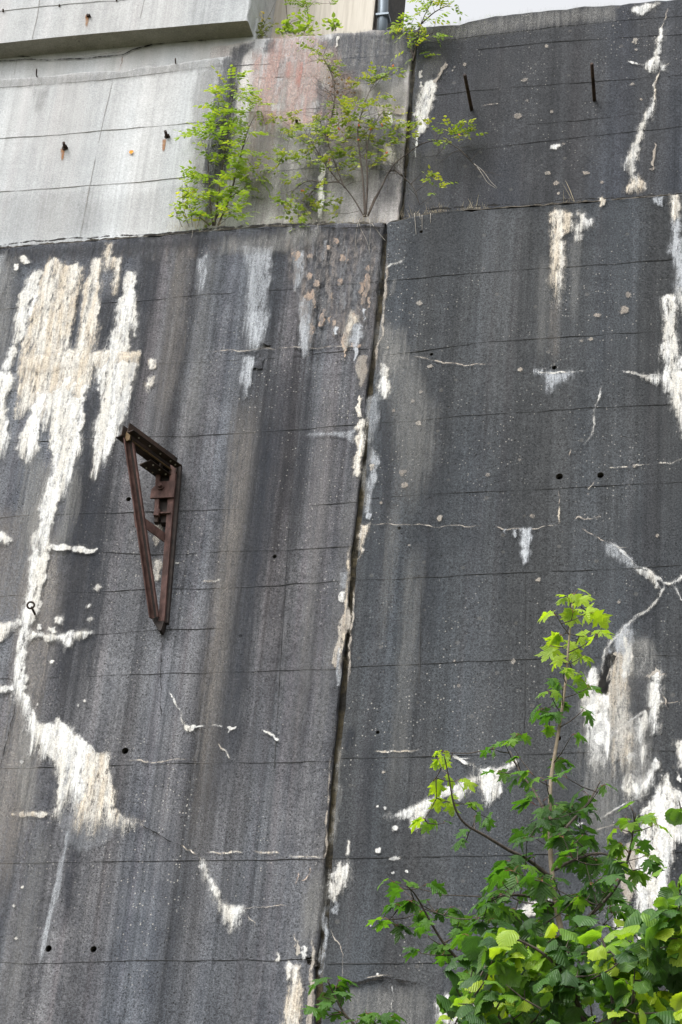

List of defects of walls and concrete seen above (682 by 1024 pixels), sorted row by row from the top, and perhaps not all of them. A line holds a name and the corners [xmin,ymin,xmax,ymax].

damp [240,236,285,388]
damp [294,251,311,350]
efflorescence [378,365,390,398]
efflorescence [538,371,569,389]
efflorescence [549,210,592,290]
efflorescence [647,194,682,429]
damp [0,244,158,906]
crack [498,491,682,655]
spalling [598,640,621,695]
efflorescence [581,629,682,930]